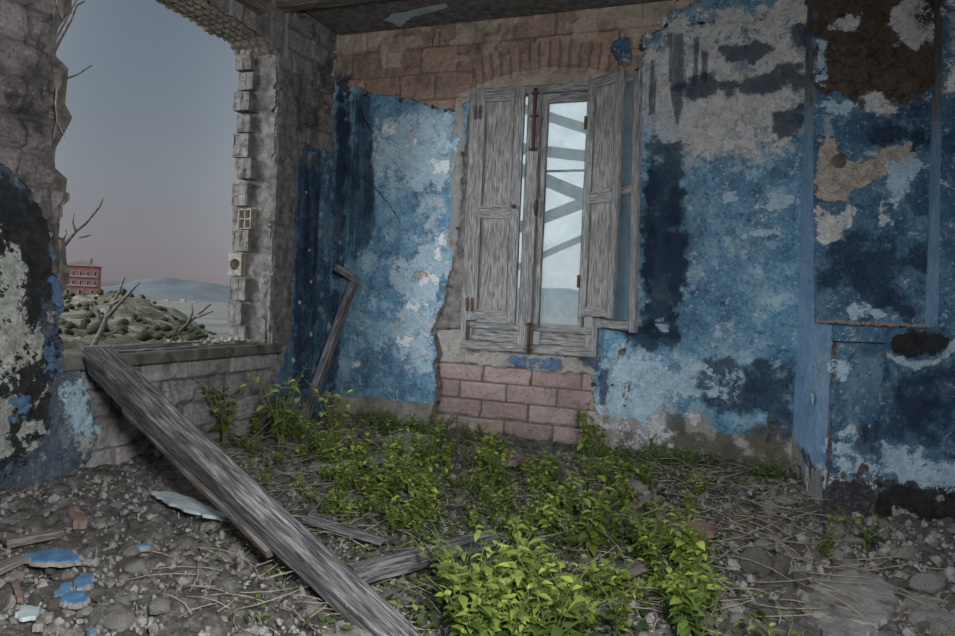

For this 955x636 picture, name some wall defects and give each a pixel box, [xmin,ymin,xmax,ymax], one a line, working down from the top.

peeling [8,393,31,423]
peeling [43,342,64,378]
flaking render [334,0,813,448]
water stain [579,136,796,452]
spalling [813,135,924,245]
water stain [876,338,955,522]